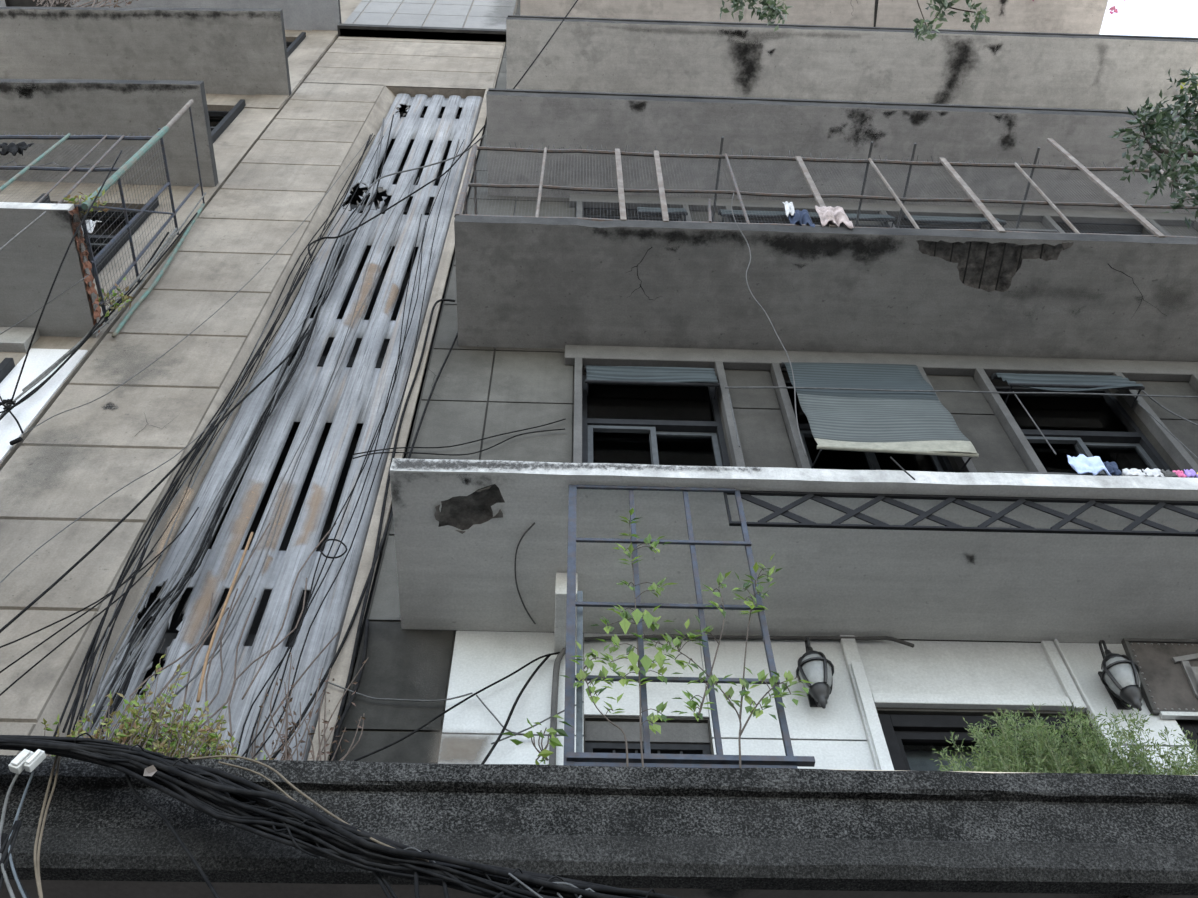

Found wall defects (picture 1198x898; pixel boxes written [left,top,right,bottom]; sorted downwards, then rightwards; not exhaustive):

damp [830,41,972,143]
damp [995,114,1015,147]
spalling [917,240,1074,292]
spalling [434,484,505,534]